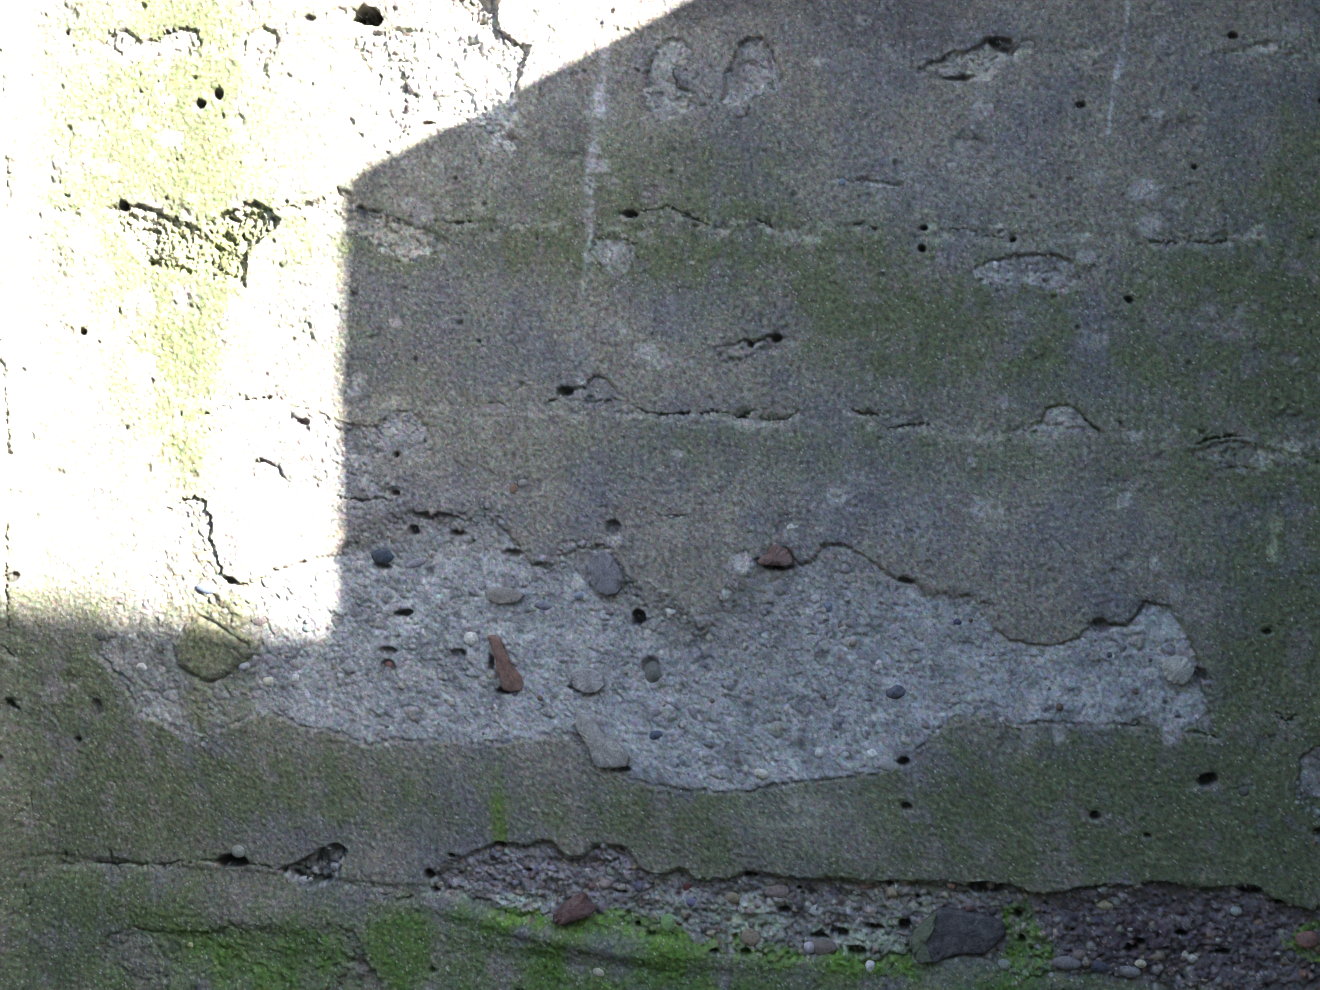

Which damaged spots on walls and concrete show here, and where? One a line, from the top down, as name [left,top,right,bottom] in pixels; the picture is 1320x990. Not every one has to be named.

spalling [341,0,533,162]
spalling [639,36,787,126]
spalling [914,36,1041,92]
spalling [105,200,273,279]
spalling [297,184,460,266]
spalling [974,252,1087,300]
crack [658,407,786,424]
spalling [88,400,1220,797]
crack [109,850,187,875]
crack [250,863,275,871]
water stain [0,856,115,990]
spalling [430,839,1320,990]